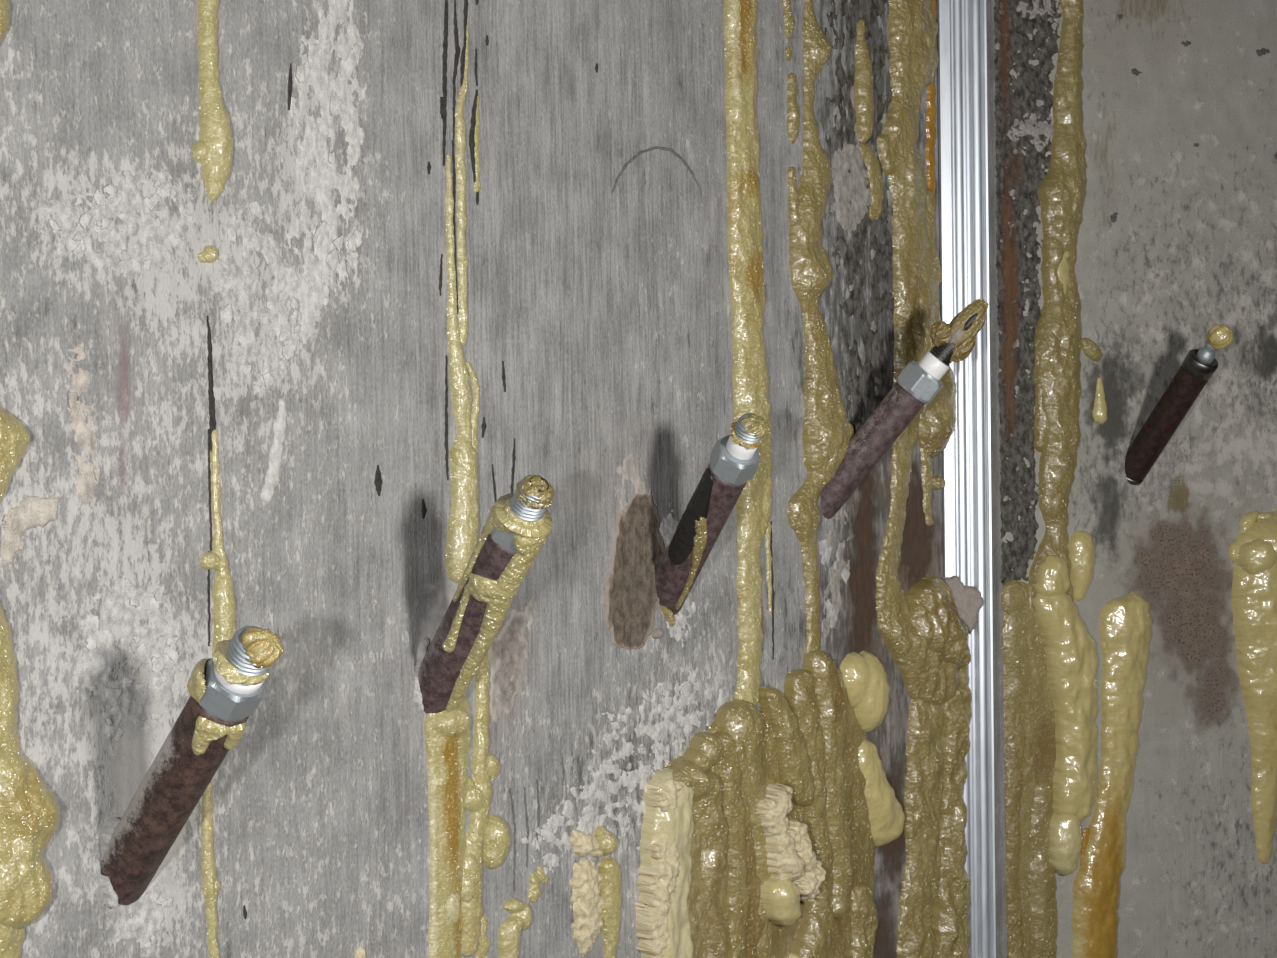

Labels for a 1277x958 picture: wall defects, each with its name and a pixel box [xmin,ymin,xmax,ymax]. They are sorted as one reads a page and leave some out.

crack [439,0,479,314]
crack [207,316,216,646]
crack [443,355,451,480]
spalling [604,454,697,650]